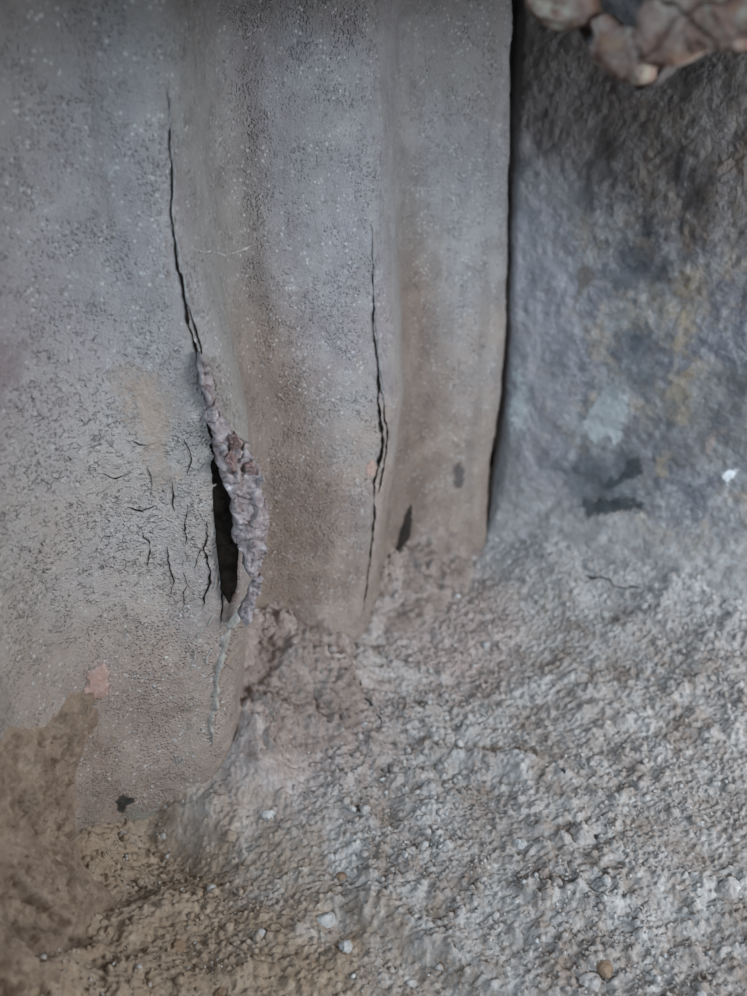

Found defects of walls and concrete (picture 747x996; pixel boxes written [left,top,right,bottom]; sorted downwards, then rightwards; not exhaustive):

spalling [525,0,604,31]
crack [101,83,223,620]
spalling [192,431,264,743]
crack [364,225,389,605]
damp [721,469,738,486]